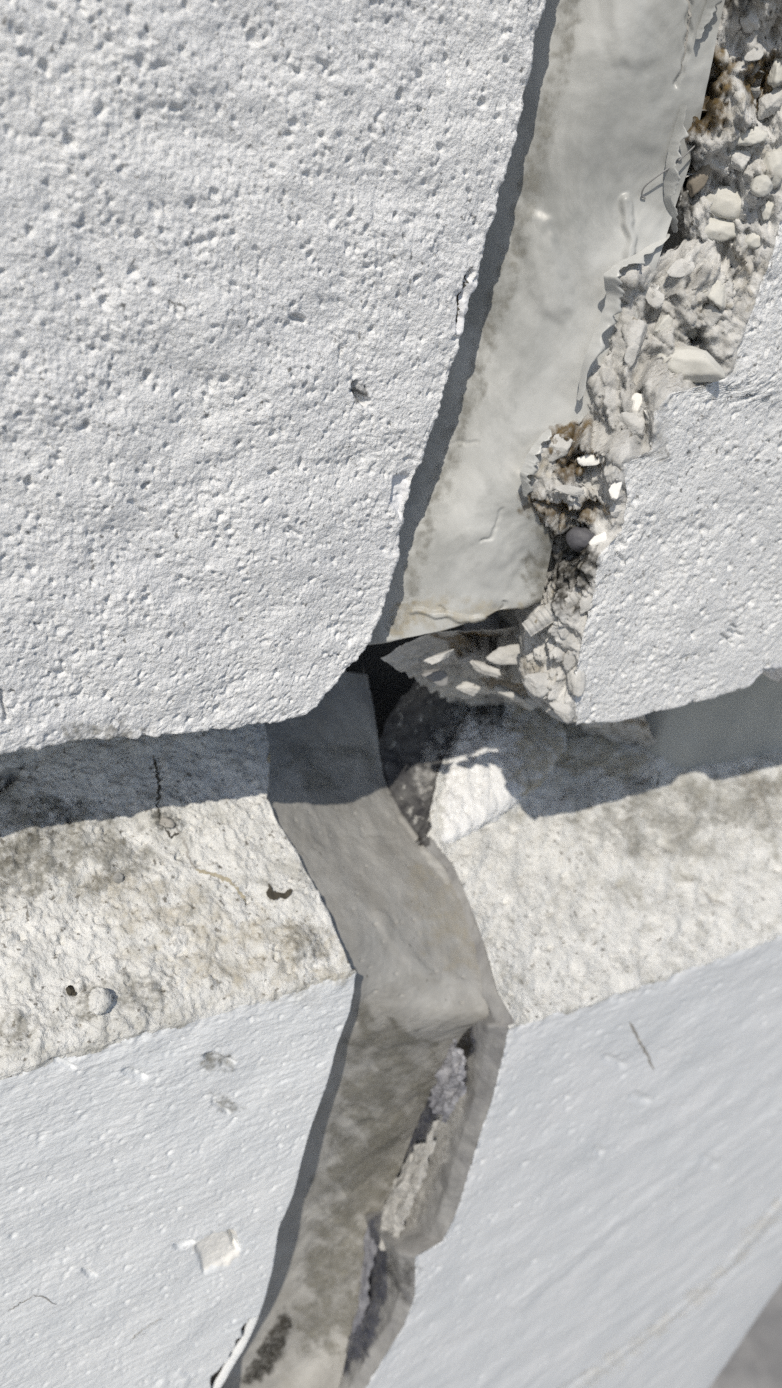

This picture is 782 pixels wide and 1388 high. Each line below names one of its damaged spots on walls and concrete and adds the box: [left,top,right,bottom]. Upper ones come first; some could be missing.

spalling [379,0,782,847]